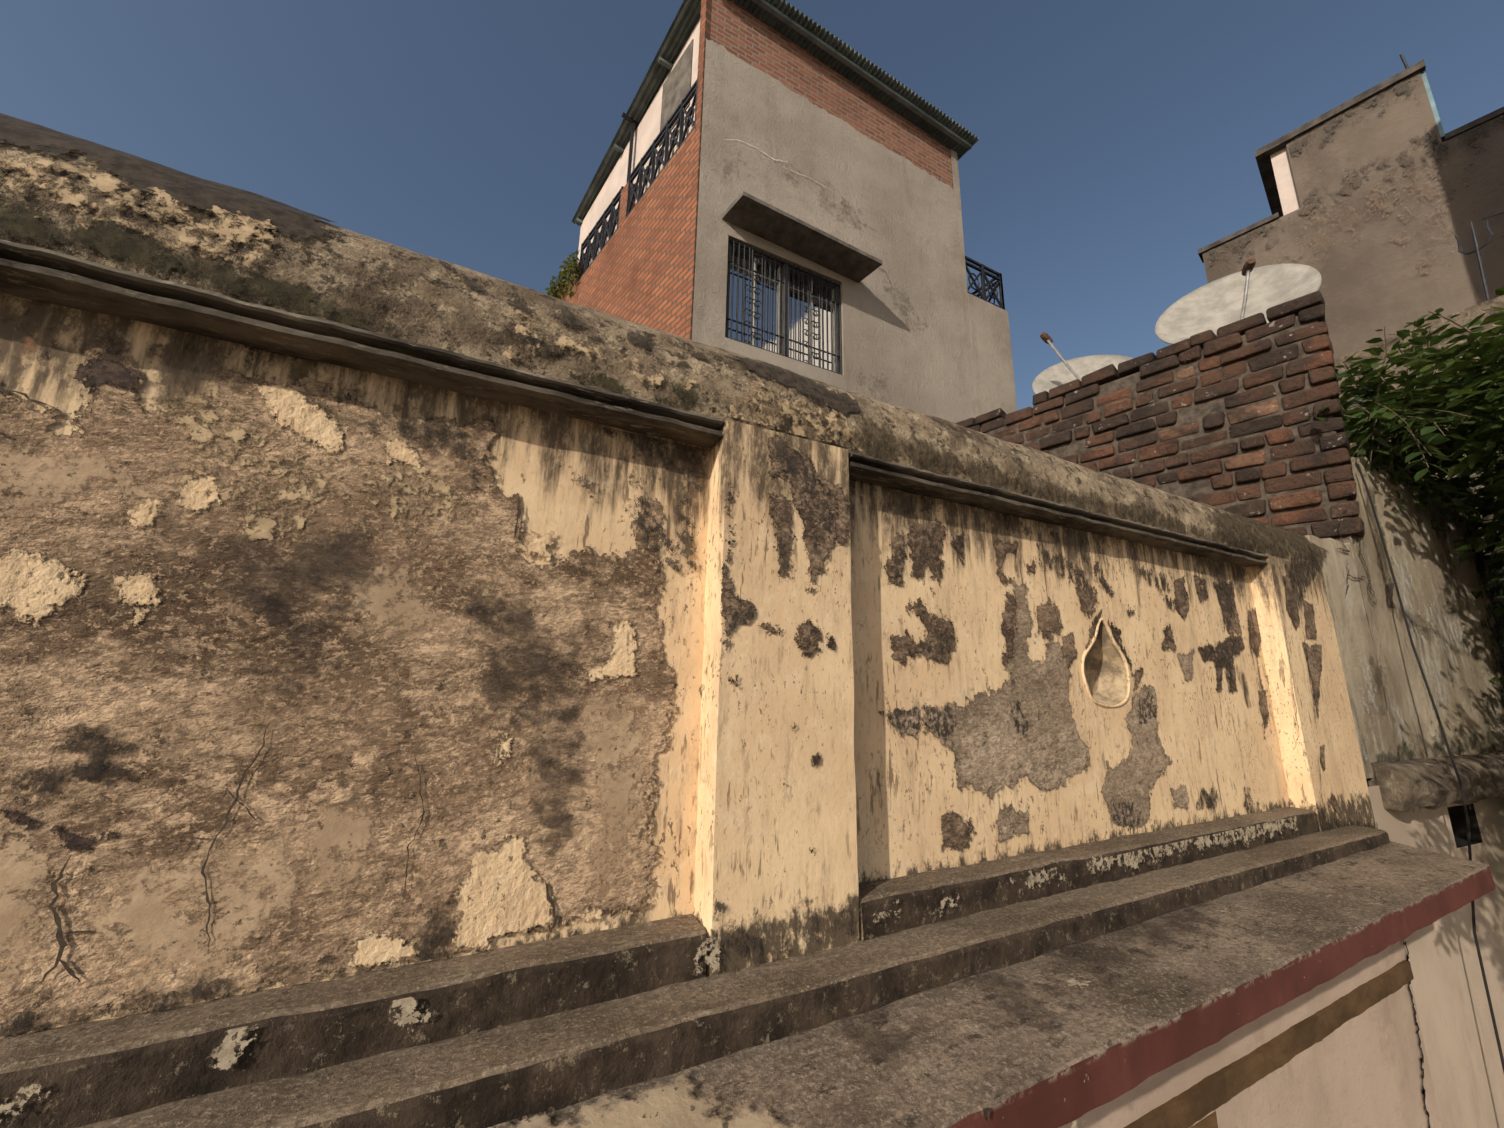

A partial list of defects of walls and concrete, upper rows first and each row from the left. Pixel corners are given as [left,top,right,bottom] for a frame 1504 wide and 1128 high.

water stain [0,113,337,242]
water stain [147,329,260,402]
water stain [220,530,379,619]
peeling [0,346,684,1039]
water stain [464,592,585,856]
peeling [720,483,836,658]
peeling [724,381,866,600]
peeling [879,518,1190,843]
peeling [1161,575,1262,695]
water stain [1365,488,1485,708]
crack [39,854,95,984]
crack [186,722,270,952]